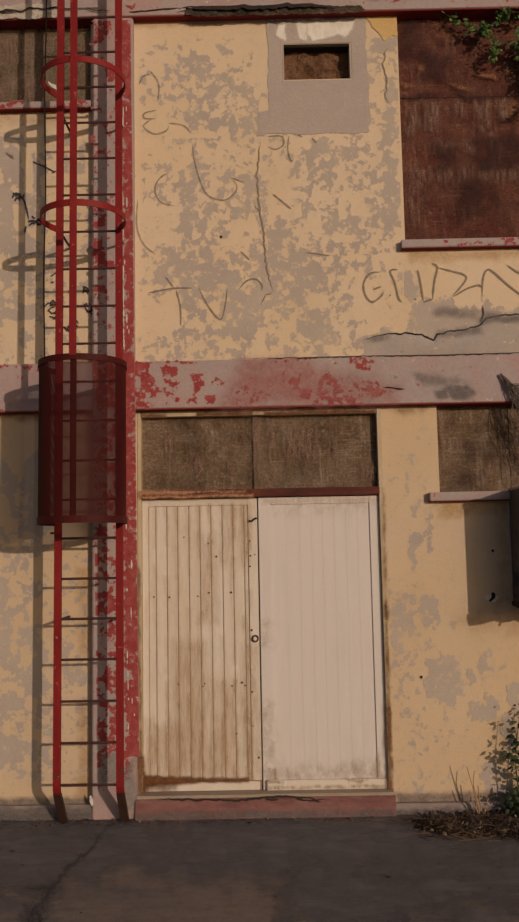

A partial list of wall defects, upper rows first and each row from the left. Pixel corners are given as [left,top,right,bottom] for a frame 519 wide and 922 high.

spalling [0,2,57,20]
spalling [186,4,365,17]
peeling [391,262,519,339]
crack [239,305,519,359]
peeling [0,20,402,789]
peeling [386,424,519,798]
rust [137,750,253,794]